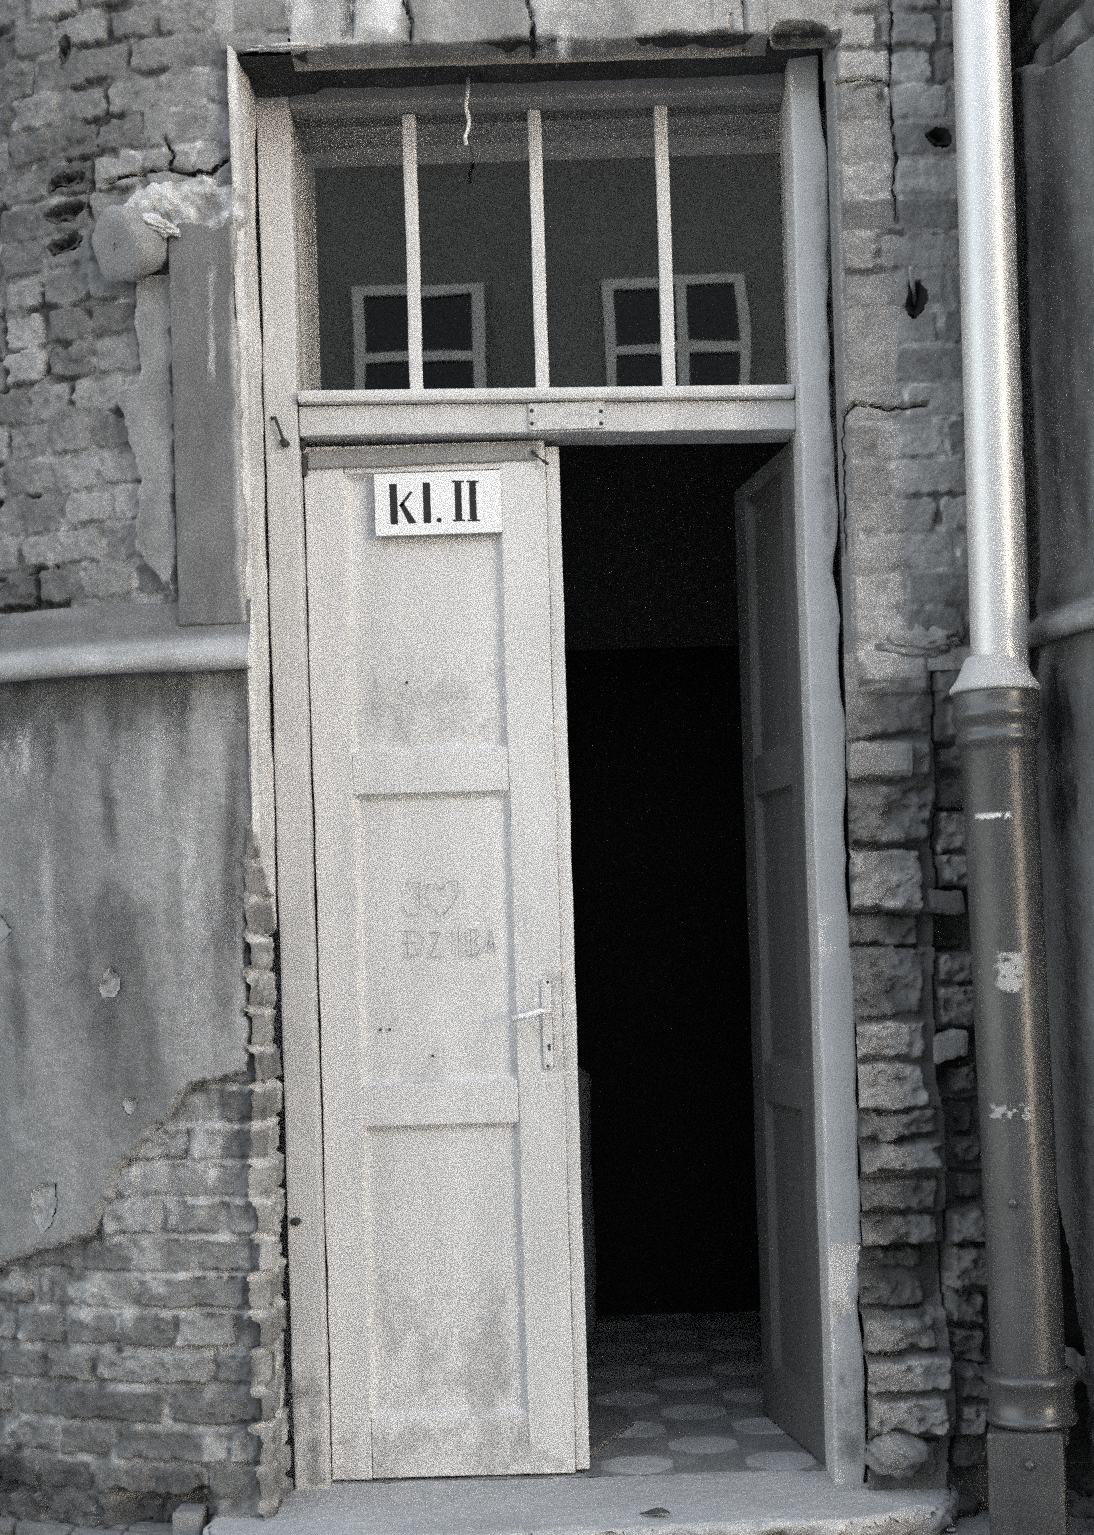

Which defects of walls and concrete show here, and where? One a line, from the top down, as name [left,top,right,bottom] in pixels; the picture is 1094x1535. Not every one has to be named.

crack [402,0,414,42]
crack [525,0,536,46]
crack [840,0,898,219]
spalling [925,126,950,145]
spalling [906,282,927,317]
water stain [0,681,30,775]
water stain [146,737,168,817]
water stain [40,844,54,964]
water stain [180,832,206,1005]
spalling [503,652,991,1535]
flaking render [0,862,278,1535]
spalling [1058,1204,1094,1496]